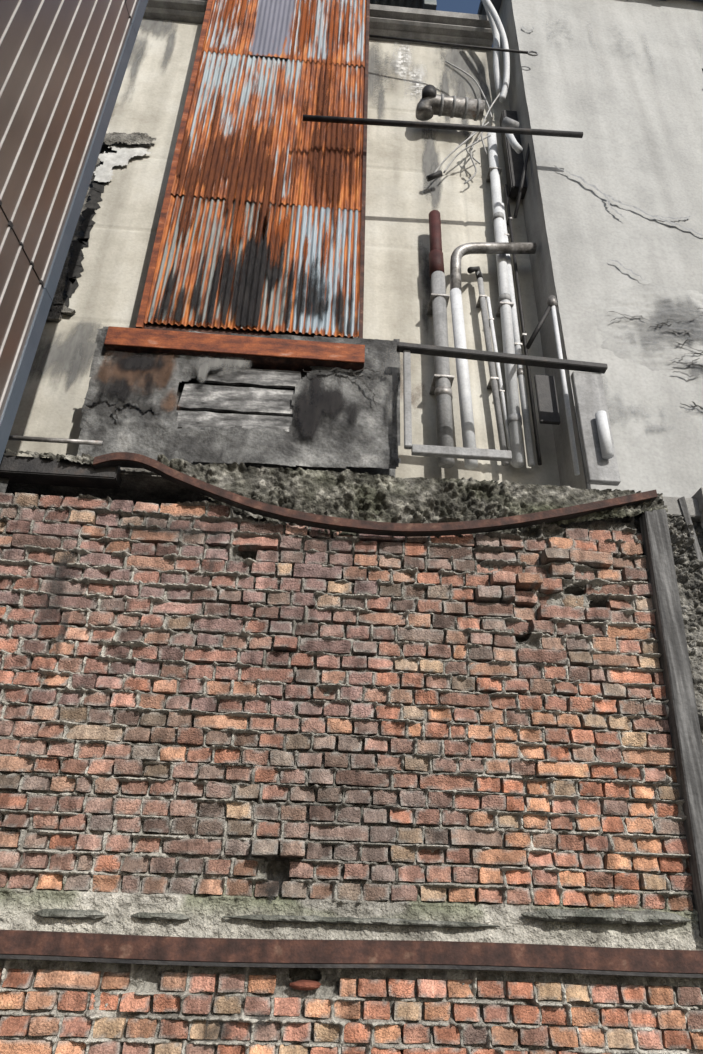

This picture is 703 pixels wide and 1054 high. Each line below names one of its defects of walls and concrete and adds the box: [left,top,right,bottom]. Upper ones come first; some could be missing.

spalling [46,132,156,322]
rust [171,0,362,271]